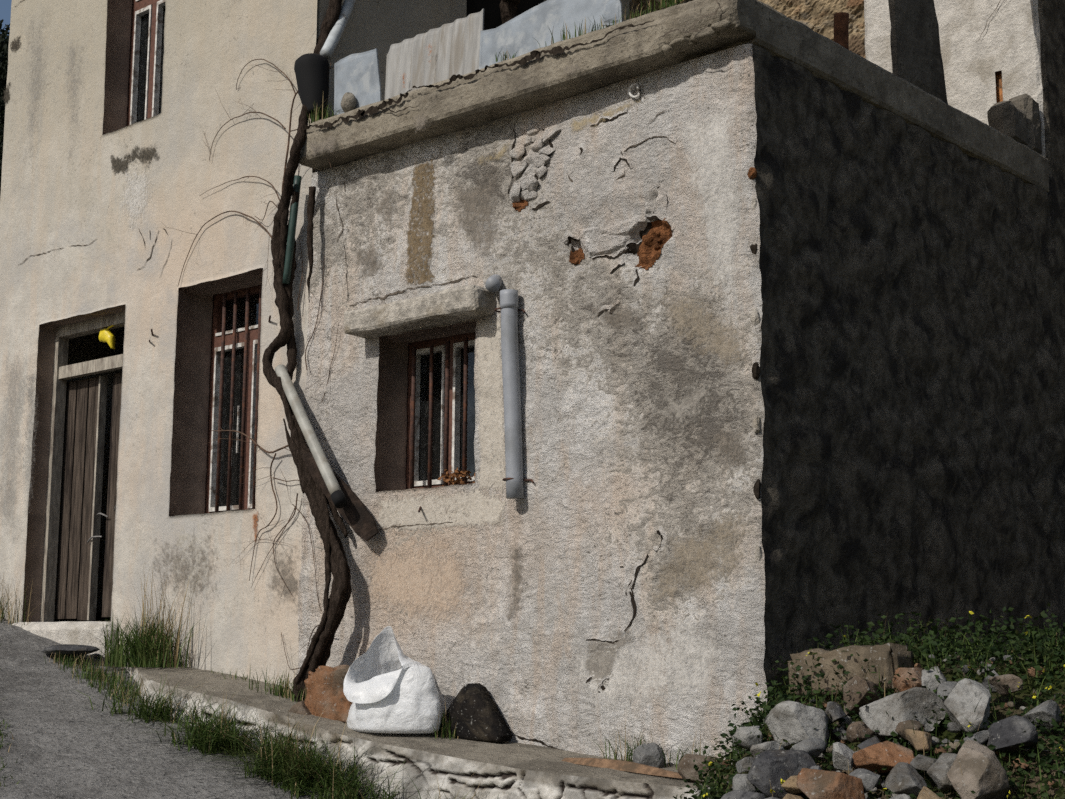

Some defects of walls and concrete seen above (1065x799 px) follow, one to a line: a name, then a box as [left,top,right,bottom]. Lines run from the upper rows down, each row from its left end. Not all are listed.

crack [303,0,725,130]
spalling [508,123,561,212]
crack [137,228,172,273]
damp [405,158,436,285]
spalling [563,183,675,270]
crack [585,553,648,644]
crack [585,675,610,692]